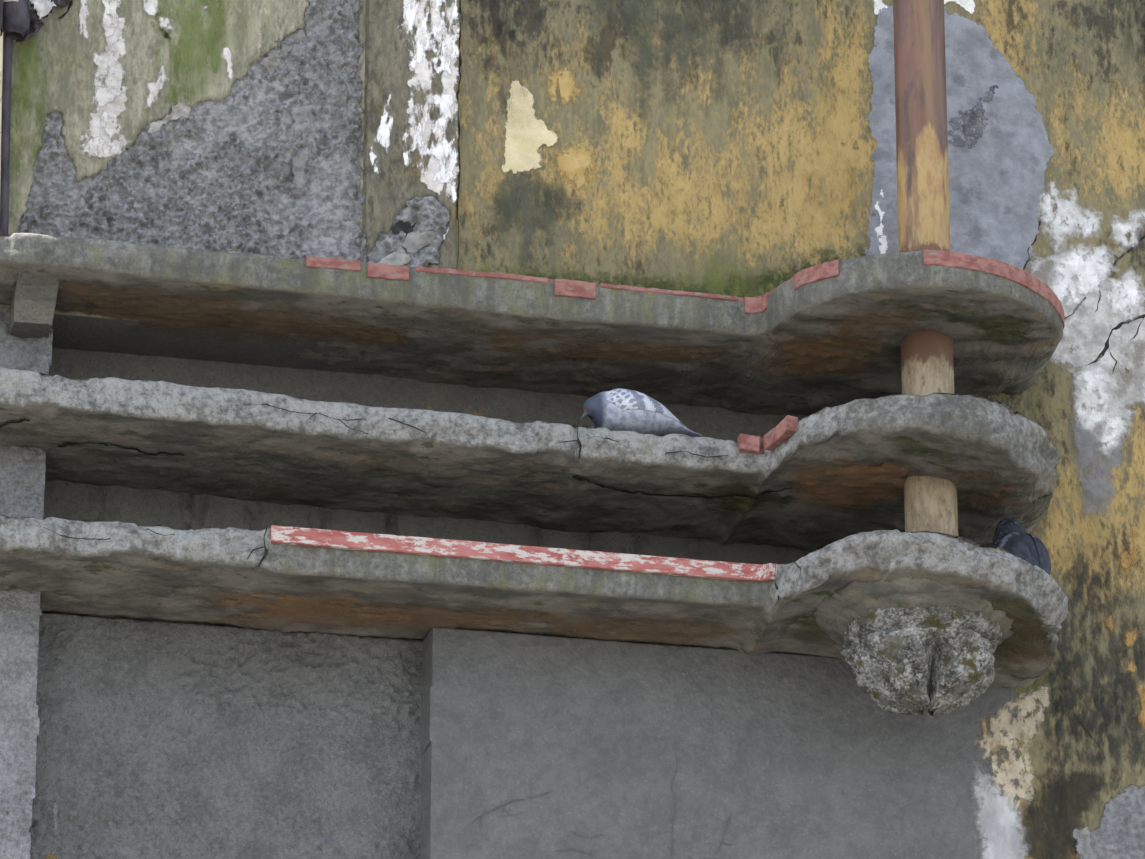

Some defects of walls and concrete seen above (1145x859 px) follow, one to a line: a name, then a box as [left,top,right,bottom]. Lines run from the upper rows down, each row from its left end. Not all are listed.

crack [59,1,73,19]
peeling [872,0,888,15]
peeling [944,0,975,14]
flaking render [18,0,459,267]
peeling [501,80,596,189]
leakage [494,174,580,261]
peeling [874,189,888,254]
crack [1064,235,1145,372]
leakage [1120,531,1137,572]
leakage [1020,553,1145,859]
peeling [973,686,1051,859]
flaking render [1073,784,1145,859]